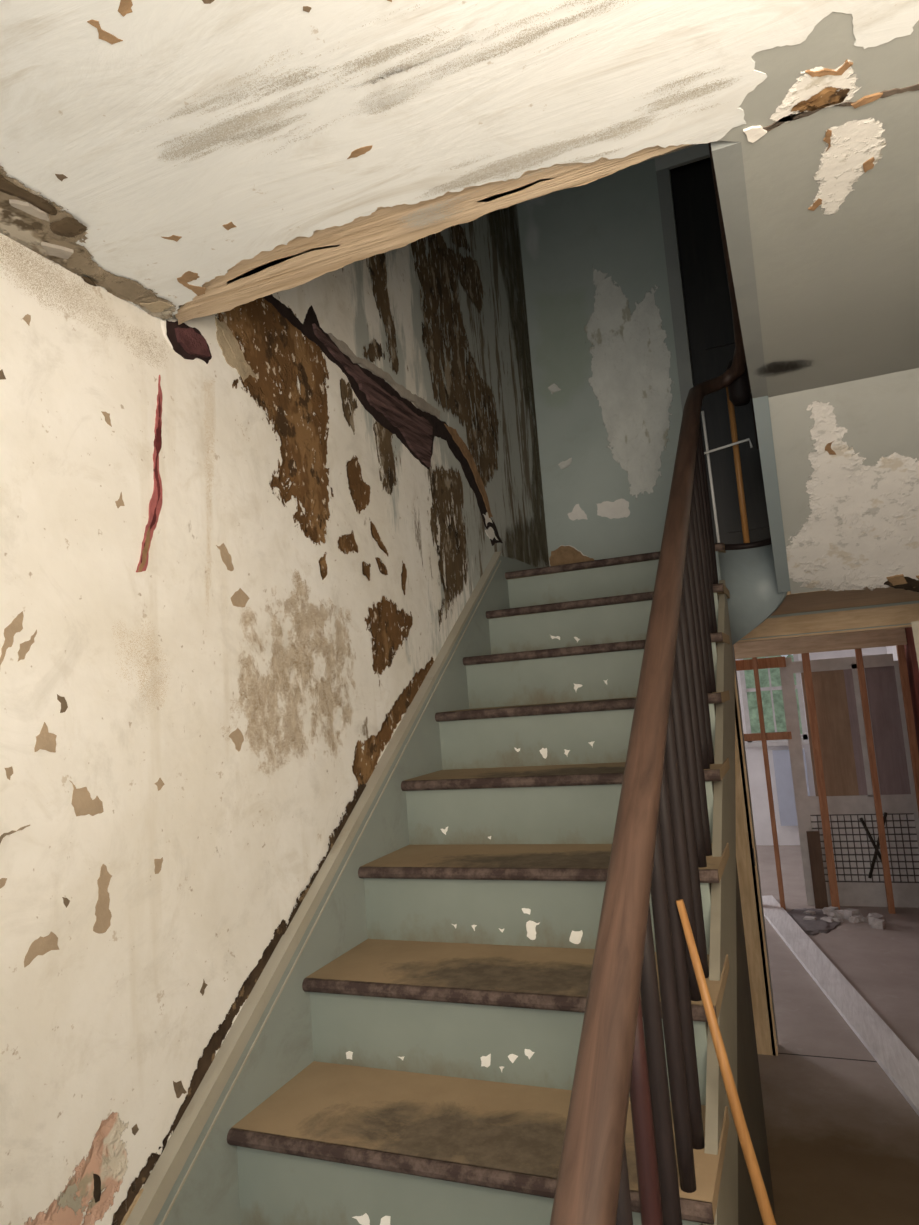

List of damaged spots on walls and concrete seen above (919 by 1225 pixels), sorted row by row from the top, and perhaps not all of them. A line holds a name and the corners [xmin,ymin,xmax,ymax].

crack [743,84,919,143]
peeling [0,0,919,675]
flaking render [34,722,57,753]
flaking render [57,694,68,713]
flaking render [352,657,434,787]
flaking render [69,780,104,816]
flaking render [154,857,163,874]
flaking render [93,864,112,934]
flaking render [24,932,60,968]
peeling [24,1112,139,1225]